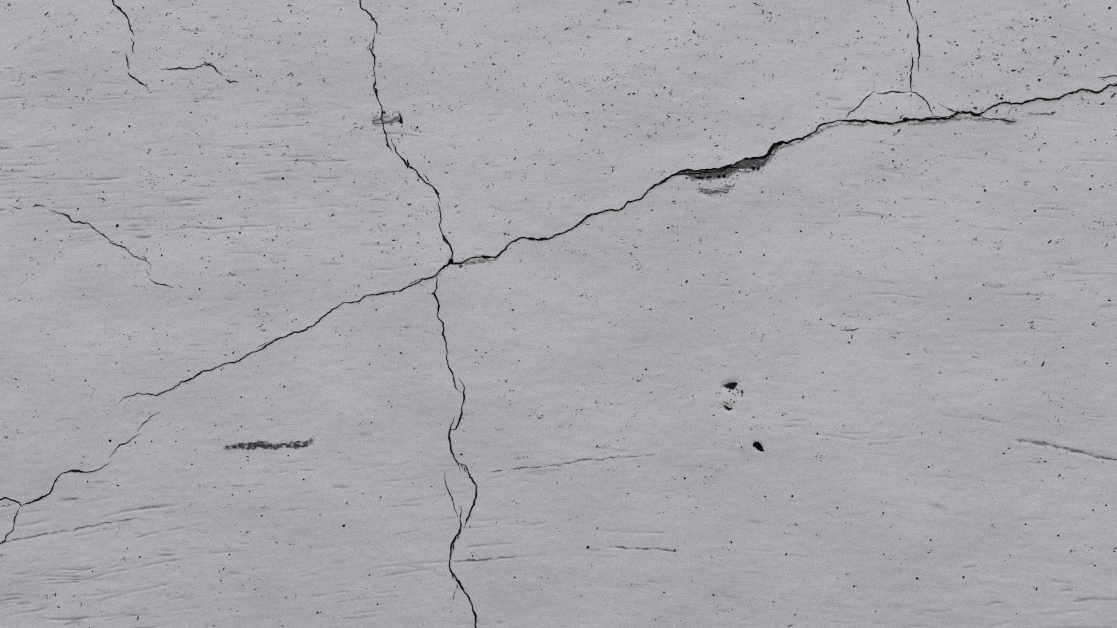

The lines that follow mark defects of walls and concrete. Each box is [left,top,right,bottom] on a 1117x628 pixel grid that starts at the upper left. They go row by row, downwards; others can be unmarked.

crack [0,0,766,628]
crack [781,0,1117,148]